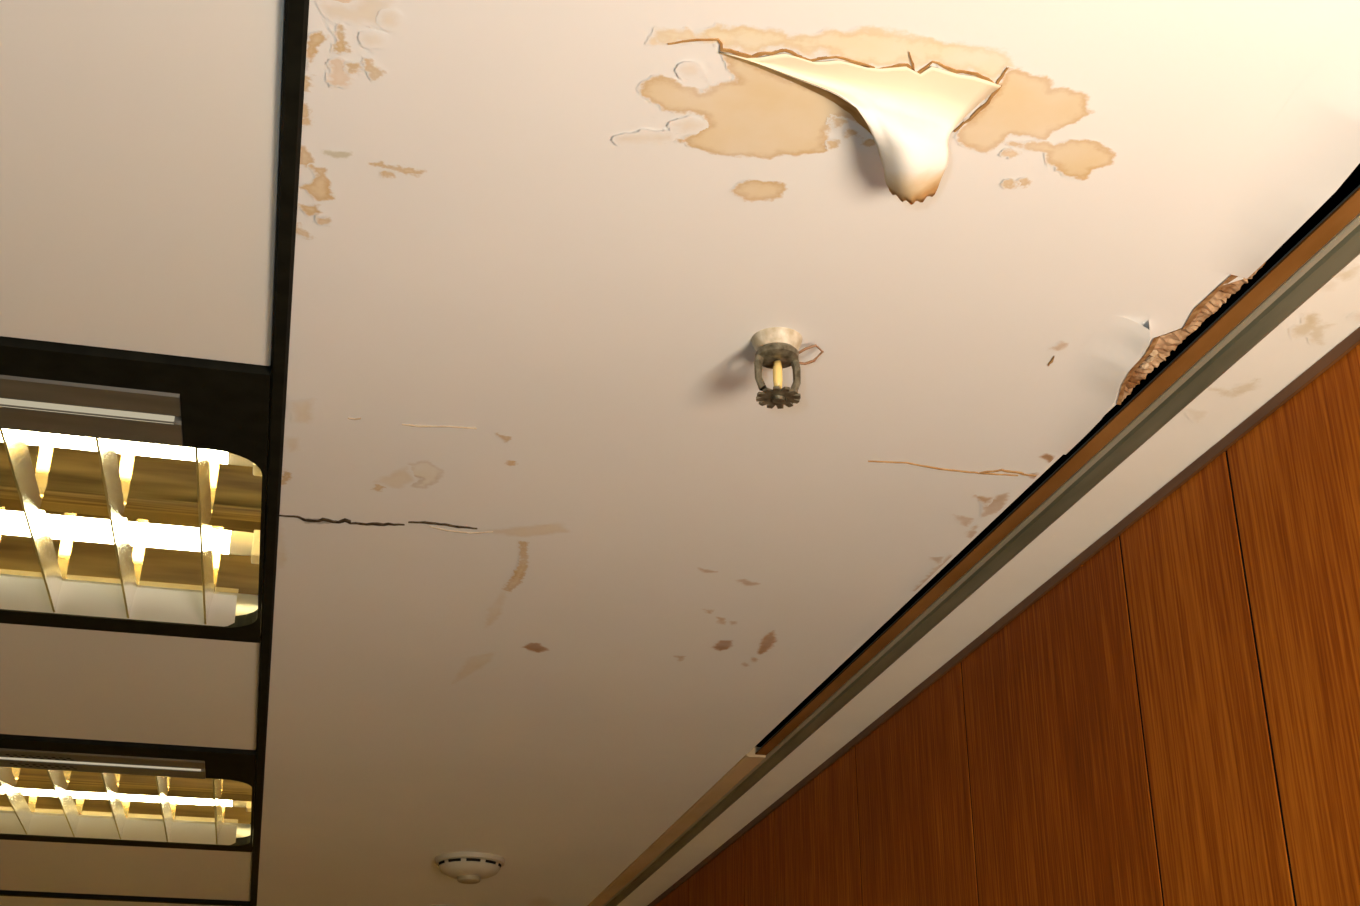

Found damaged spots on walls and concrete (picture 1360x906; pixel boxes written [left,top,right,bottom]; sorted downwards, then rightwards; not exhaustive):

peeling [302,0,404,128]
peeling [296,144,336,240]
leakage [729,179,789,203]
spalling [1030,262,1266,455]
crack [279,515,491,534]